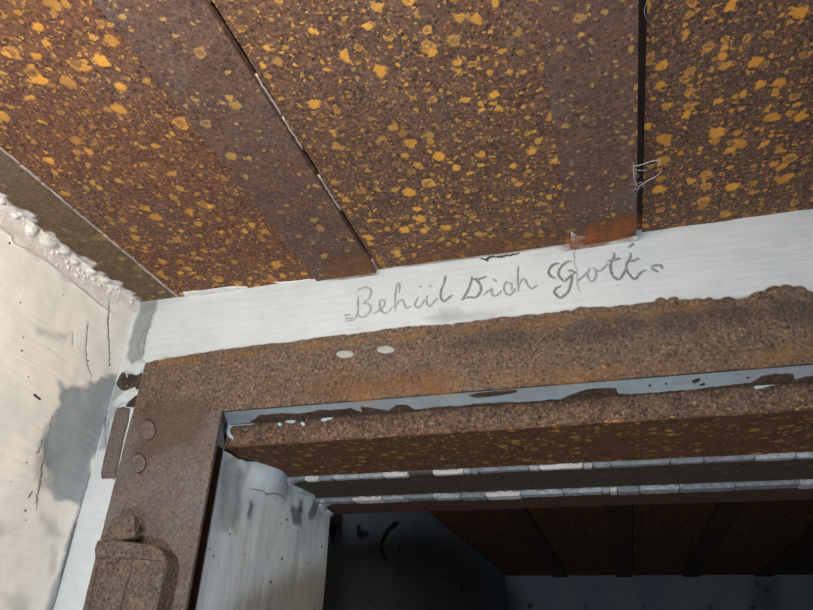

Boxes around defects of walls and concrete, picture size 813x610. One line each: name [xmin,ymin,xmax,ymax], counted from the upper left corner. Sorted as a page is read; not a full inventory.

flaking render [183,286,248,296]
corrosion [324,255,375,278]
corrosion [567,217,638,250]
crack [28,394,53,509]
damp [44,376,122,516]
damp [48,529,74,610]